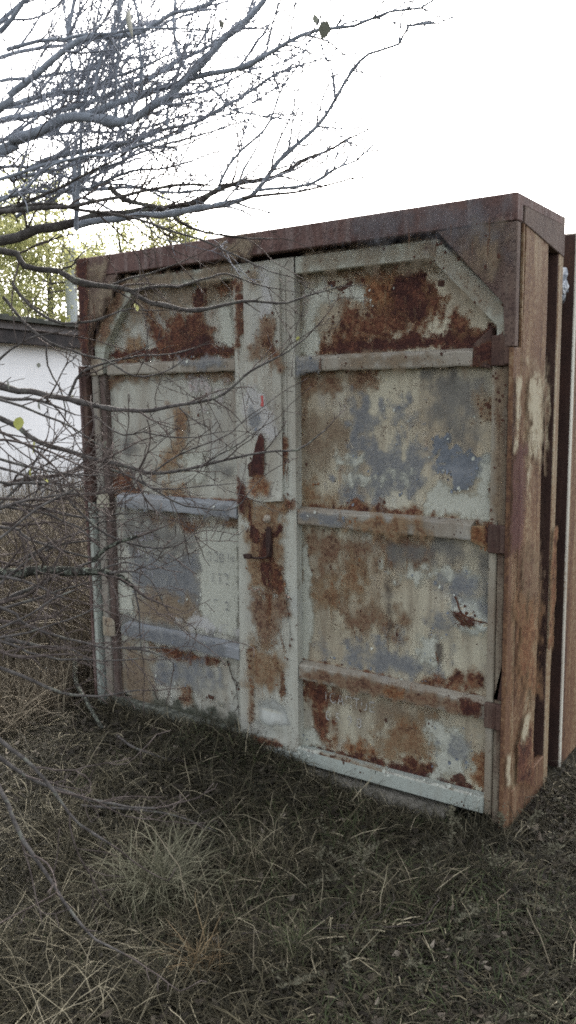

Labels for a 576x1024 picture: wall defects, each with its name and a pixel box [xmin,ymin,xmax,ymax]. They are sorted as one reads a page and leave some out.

corrosion [74,257,285,389]
corrosion [113,241,558,748]
peeling [299,386,485,526]
corrosion [299,661,485,792]